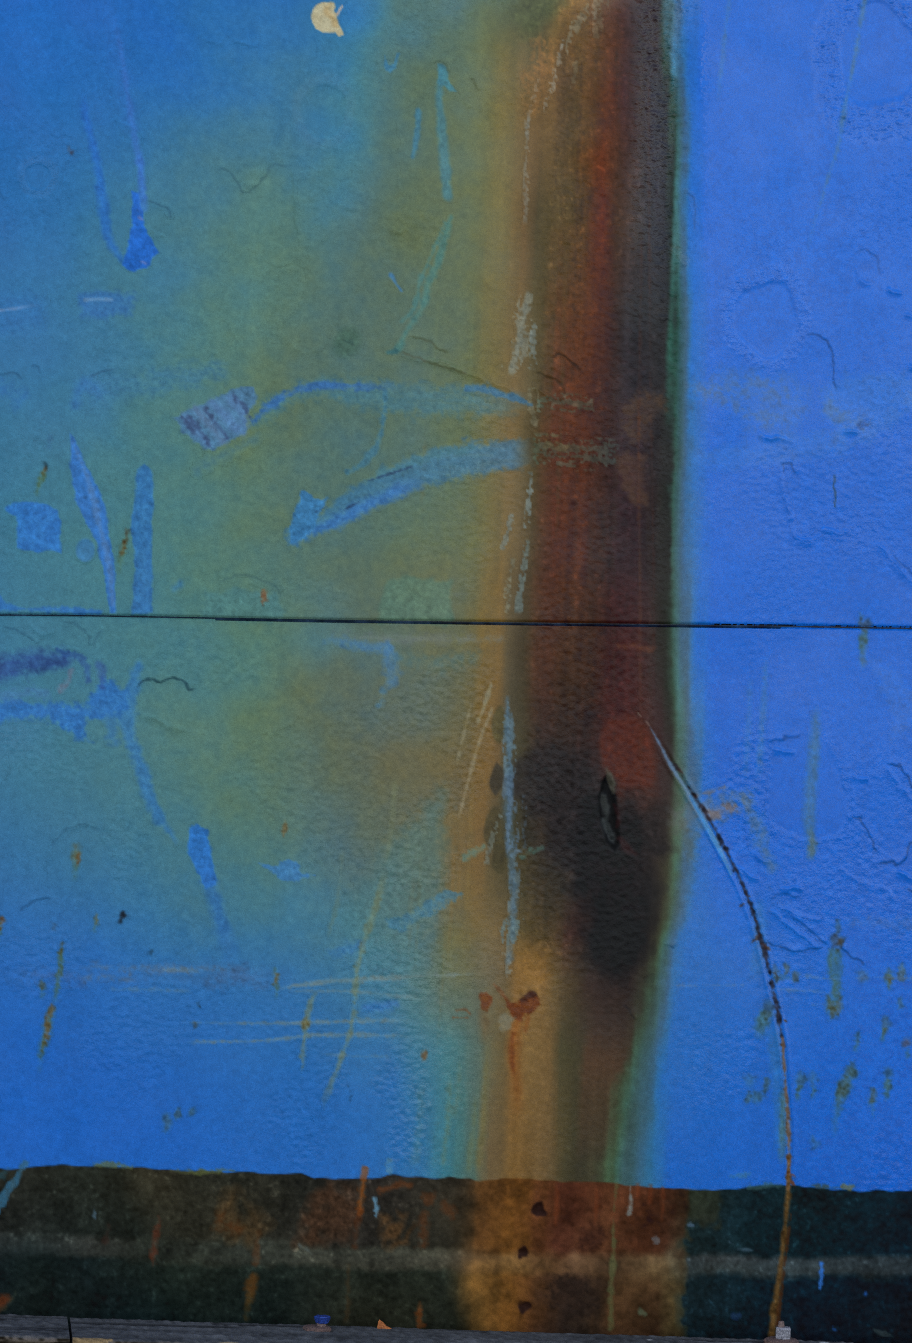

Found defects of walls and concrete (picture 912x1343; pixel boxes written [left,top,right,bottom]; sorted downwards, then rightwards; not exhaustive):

rust [718,814,912,947]
rust [746,917,769,982]
rust [35,1001,58,1073]
rust [408,1080,428,1168]
rust [427,1044,492,1174]
rust [502,988,542,1118]
rust [739,1072,773,1106]
rust [751,995,776,1041]
rust [764,918,912,1194]
rust [289,1176,359,1253]
rust [374,1176,726,1337]
rust [765,1153,794,1337]